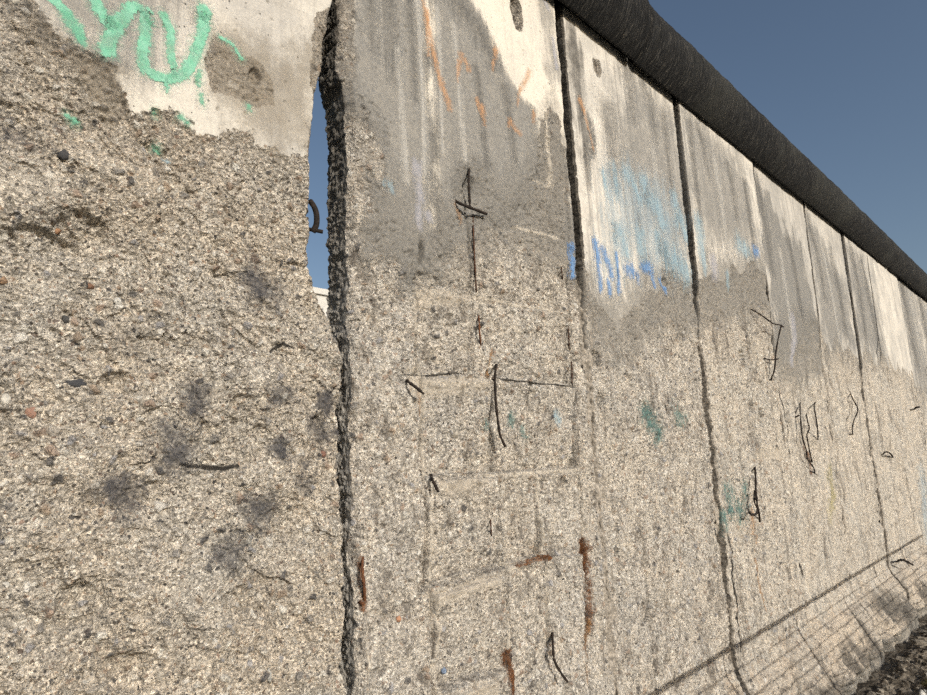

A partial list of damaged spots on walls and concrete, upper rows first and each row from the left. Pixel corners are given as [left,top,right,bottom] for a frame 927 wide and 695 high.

spalling [0,0,347,695]
spalling [334,0,927,695]
corrosion [515,555,552,568]
corrosion [579,538,593,631]
crack [727,535,742,651]
corrosion [502,649,515,695]